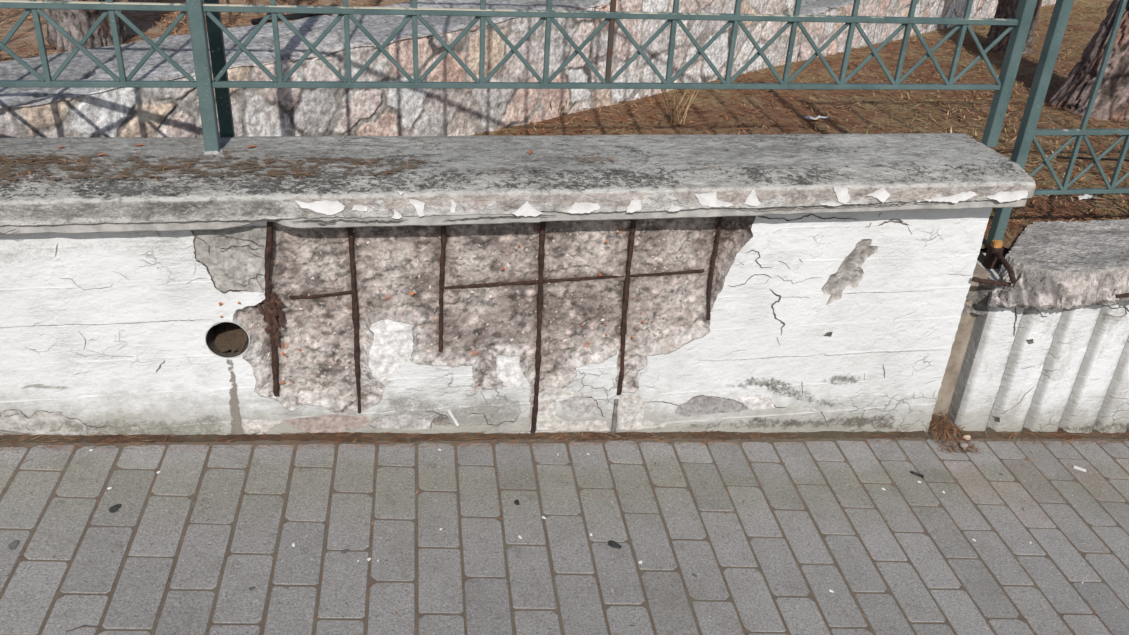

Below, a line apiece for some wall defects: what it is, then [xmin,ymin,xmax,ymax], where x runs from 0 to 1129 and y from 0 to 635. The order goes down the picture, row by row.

peeling [820,186,851,206]
peeling [867,187,890,203]
peeling [917,190,1028,203]
crack [729,202,939,234]
spalling [822,239,879,305]
spalling [233,188,775,434]
crack [648,250,941,408]